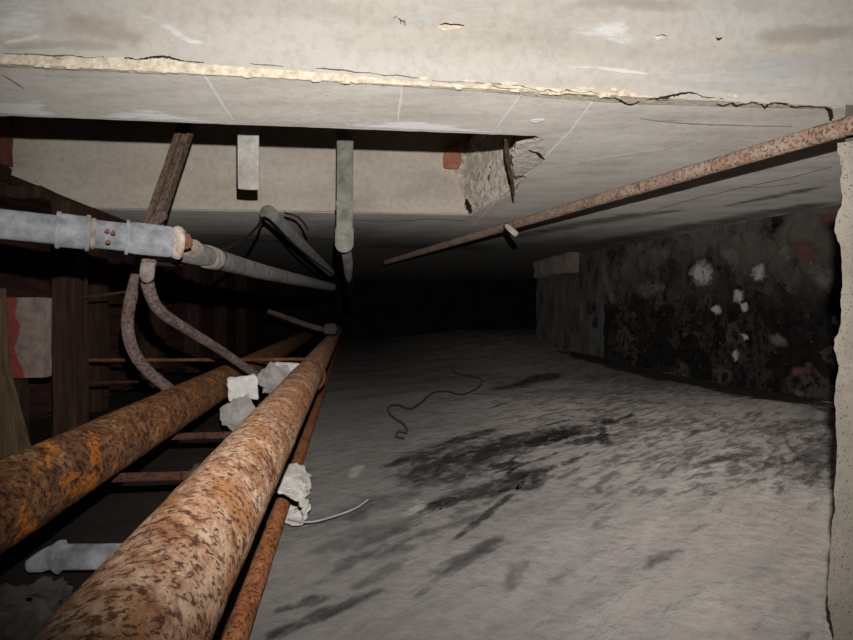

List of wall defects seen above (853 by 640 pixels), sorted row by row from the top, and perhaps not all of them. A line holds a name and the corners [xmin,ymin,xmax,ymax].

spalling [436,22,464,31]
spalling [0,55,832,109]
spalling [443,134,546,217]
crack [316,68,834,239]
damp [385,414,635,538]